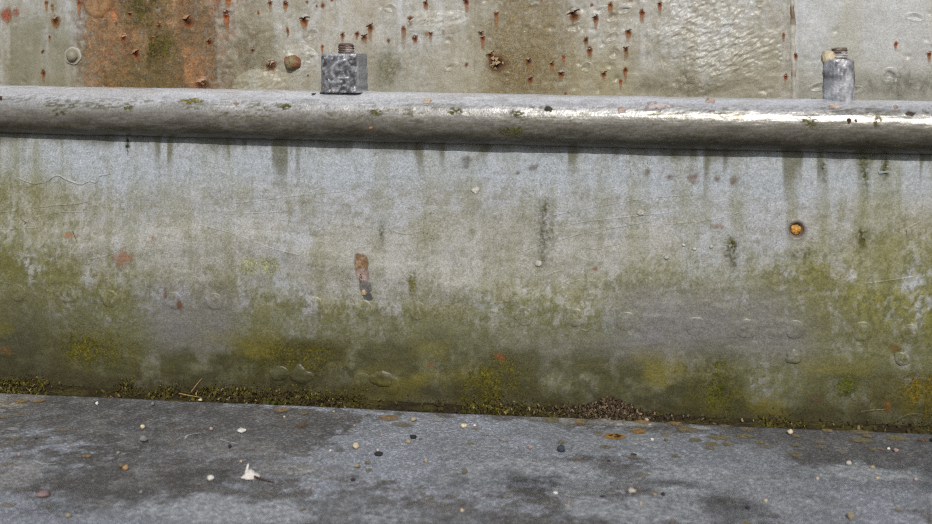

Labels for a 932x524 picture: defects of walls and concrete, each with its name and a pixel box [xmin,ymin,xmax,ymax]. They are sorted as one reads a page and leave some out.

rust [78,0,228,89]
rust [492,0,558,94]